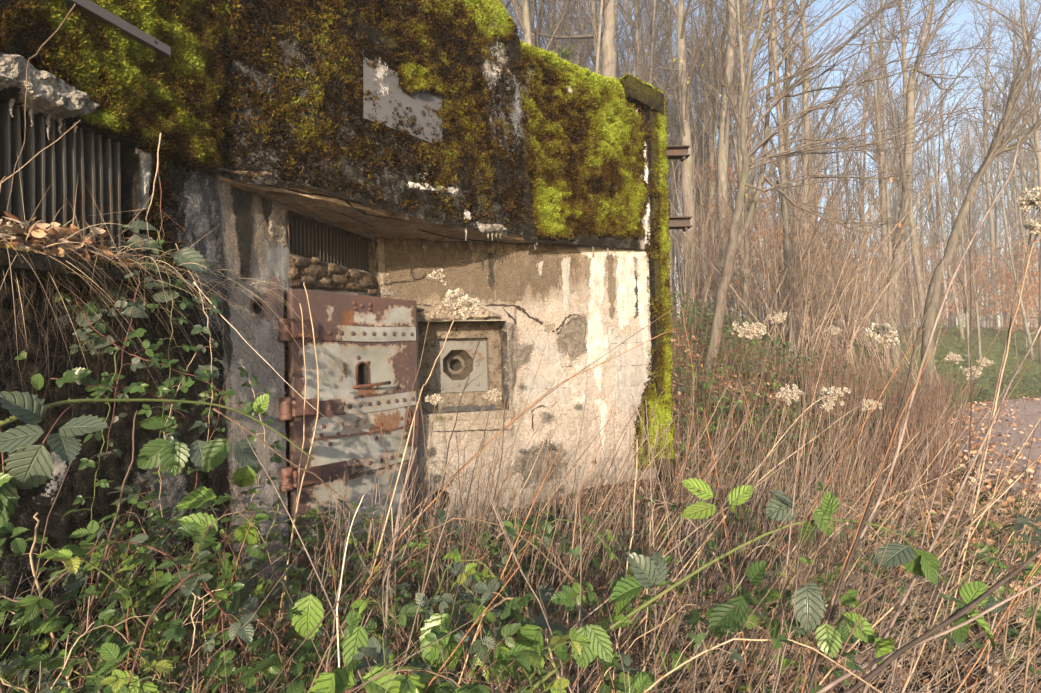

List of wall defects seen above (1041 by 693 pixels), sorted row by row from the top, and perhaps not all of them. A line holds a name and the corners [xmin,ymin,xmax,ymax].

leakage [171,170,291,372]
corrosion [341,310,354,326]
spalling [418,301,590,417]
leakage [375,126,654,459]
crack [477,304,587,367]
corrosion [369,410,400,435]
crack [433,368,557,441]